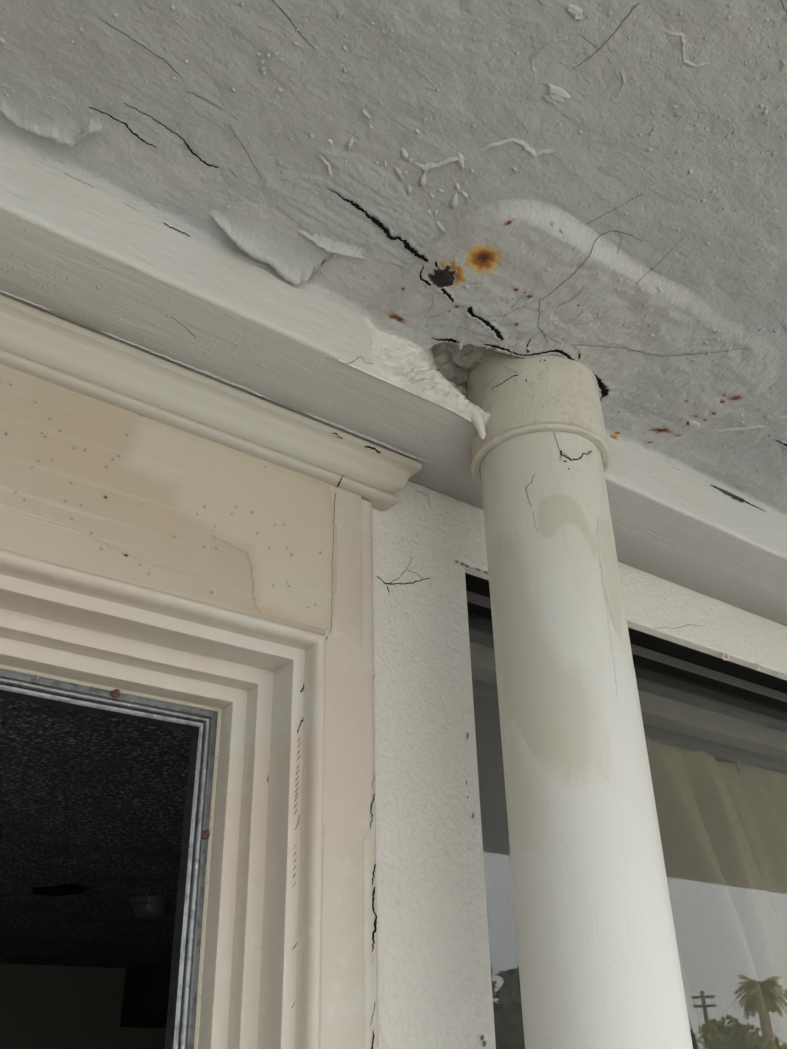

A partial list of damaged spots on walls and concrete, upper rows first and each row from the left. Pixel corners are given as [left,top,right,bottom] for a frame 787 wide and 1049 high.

crack [89,20,262,179]
peeling [0,79,404,313]
peeling [375,148,468,234]
rust [426,242,505,291]
crack [329,189,750,397]
crack [553,431,591,469]
crack [774,439,787,457]
crack [377,558,431,594]
crack [368,773,376,829]
crack [370,864,378,961]